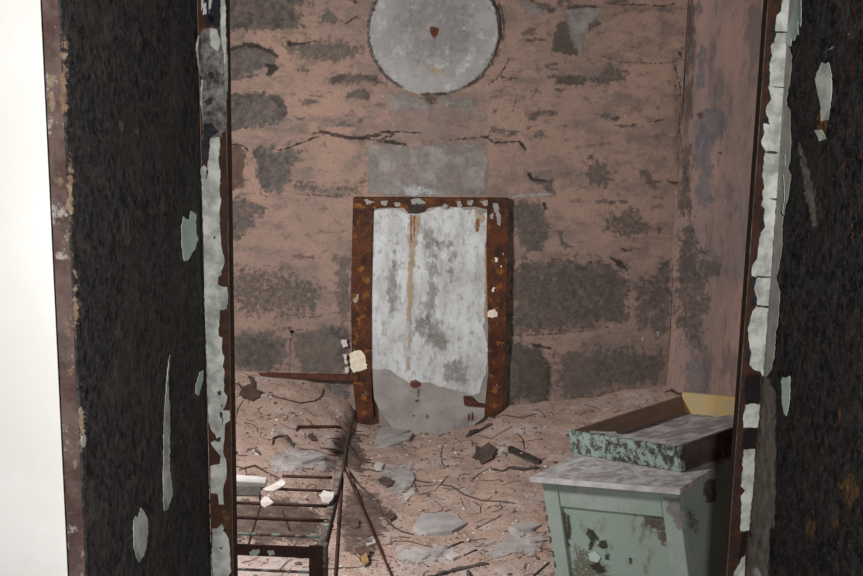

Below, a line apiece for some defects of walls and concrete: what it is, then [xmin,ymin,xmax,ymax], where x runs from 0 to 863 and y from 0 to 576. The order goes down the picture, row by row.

crack [279,130,420,151]
crack [449,136,526,151]
peeling [815,62,832,141]
corrosion [407,203,425,347]
peeling [181,0,667,508]
peeling [734,0,802,576]
peeling [162,355,173,511]
peeling [133,508,148,563]